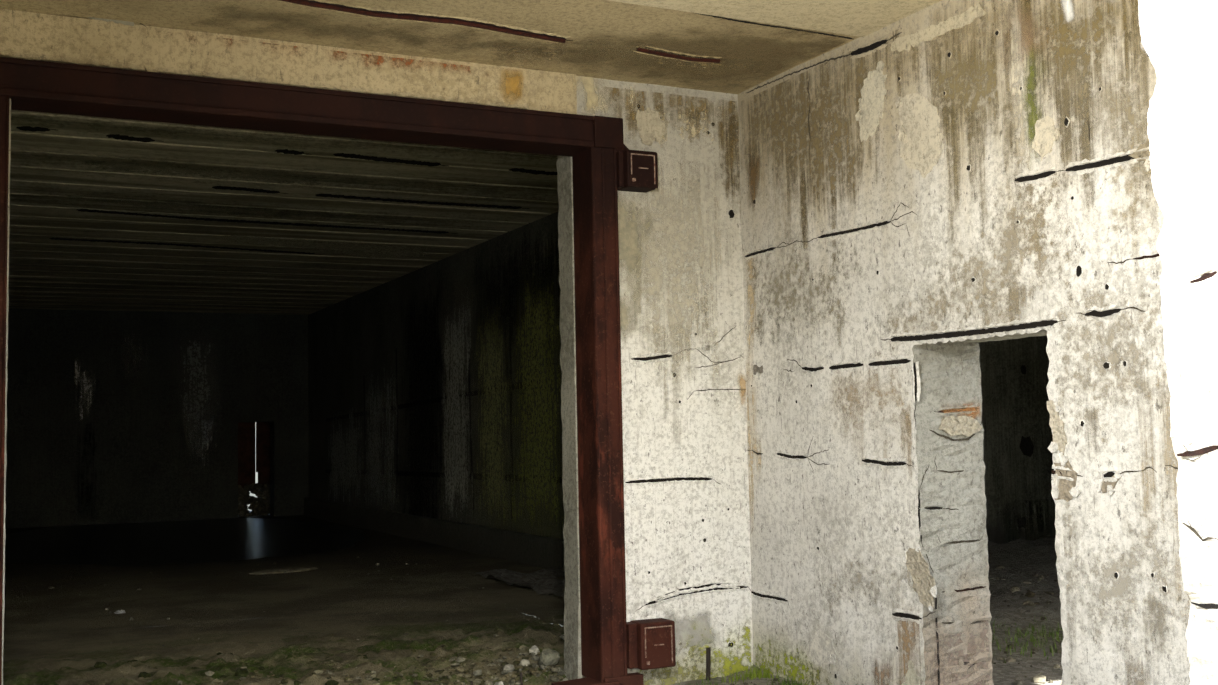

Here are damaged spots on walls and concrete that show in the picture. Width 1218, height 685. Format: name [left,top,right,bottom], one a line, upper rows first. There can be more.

damp [476,0,1148,228]
peeling [855,2,986,178]
crack [1015,120,1150,188]
crack [745,203,917,261]
damp [887,183,1069,333]
crack [631,325,746,397]
spalling [902,547,937,612]